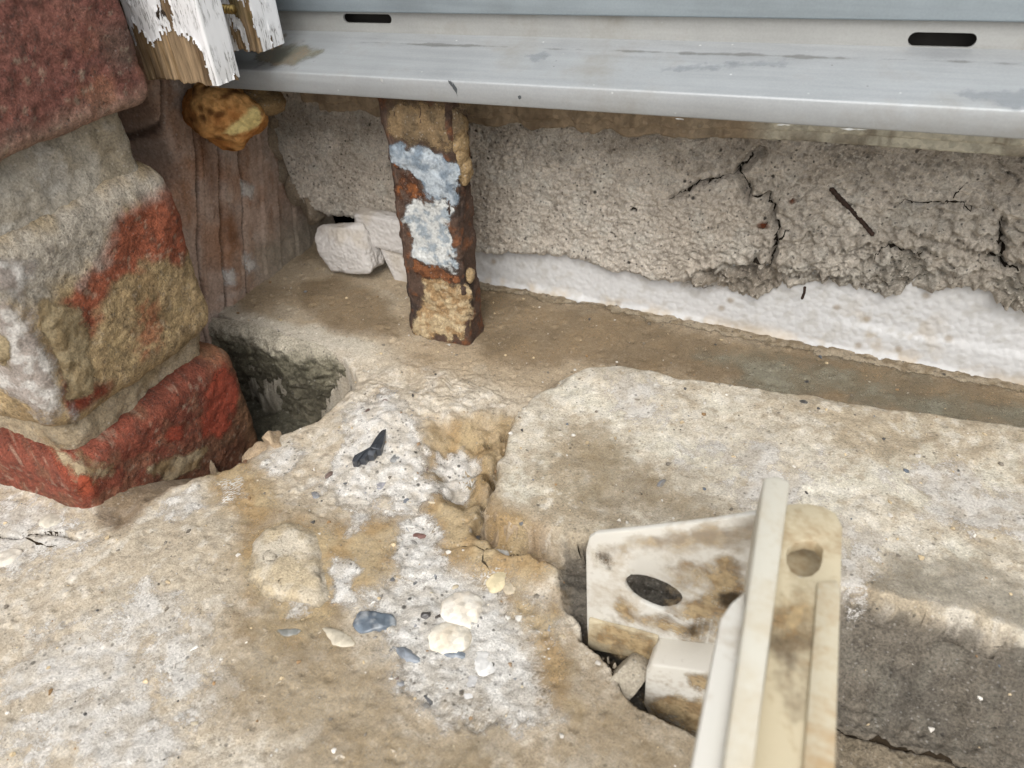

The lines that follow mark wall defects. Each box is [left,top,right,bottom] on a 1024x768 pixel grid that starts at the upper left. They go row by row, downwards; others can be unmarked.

rust [394,164,423,200]
rust [412,259,461,284]
crack [670,149,789,265]
crack [874,243,924,262]
crack [901,181,1019,271]
peeling [0,495,101,576]
spalling [156,484,203,521]
spalling [208,317,566,740]
peeling [0,575,248,768]